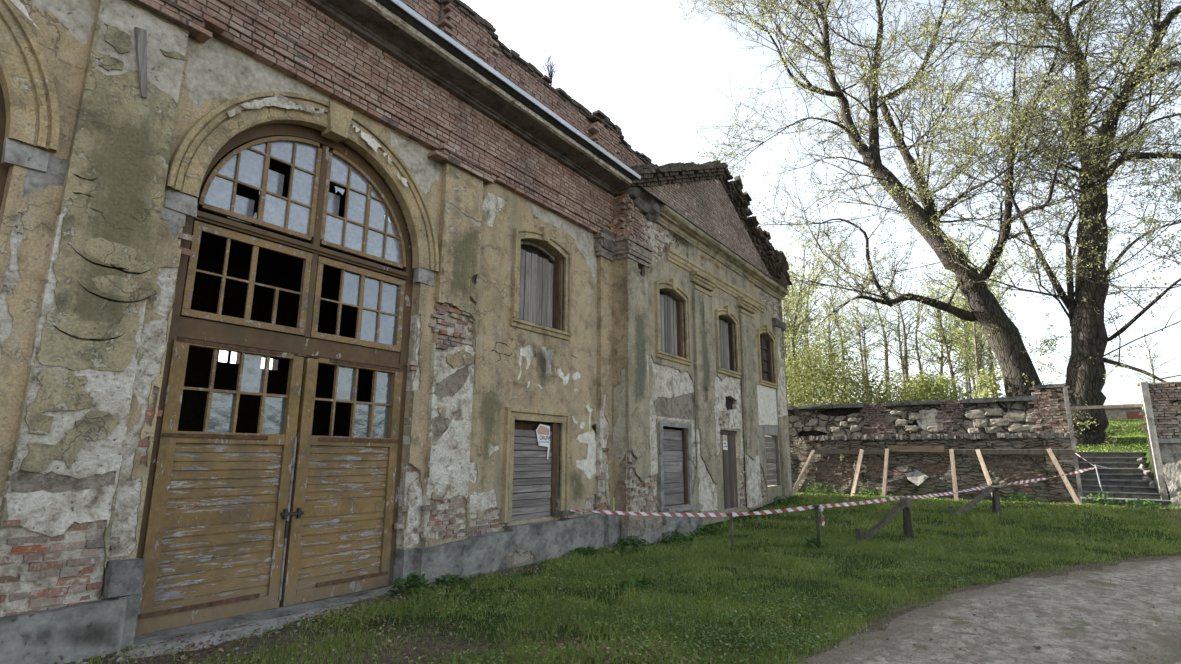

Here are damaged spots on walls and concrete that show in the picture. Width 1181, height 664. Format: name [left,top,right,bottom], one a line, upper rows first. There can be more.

peeling [23,146,68,197]
damp [93,123,149,246]
damp [85,258,125,319]
flaking render [0,198,194,617]
flaking render [394,299,505,548]
peeling [518,345,581,392]
flaking render [555,355,718,519]
flaking render [714,285,828,508]
spalling [820,408,862,417]